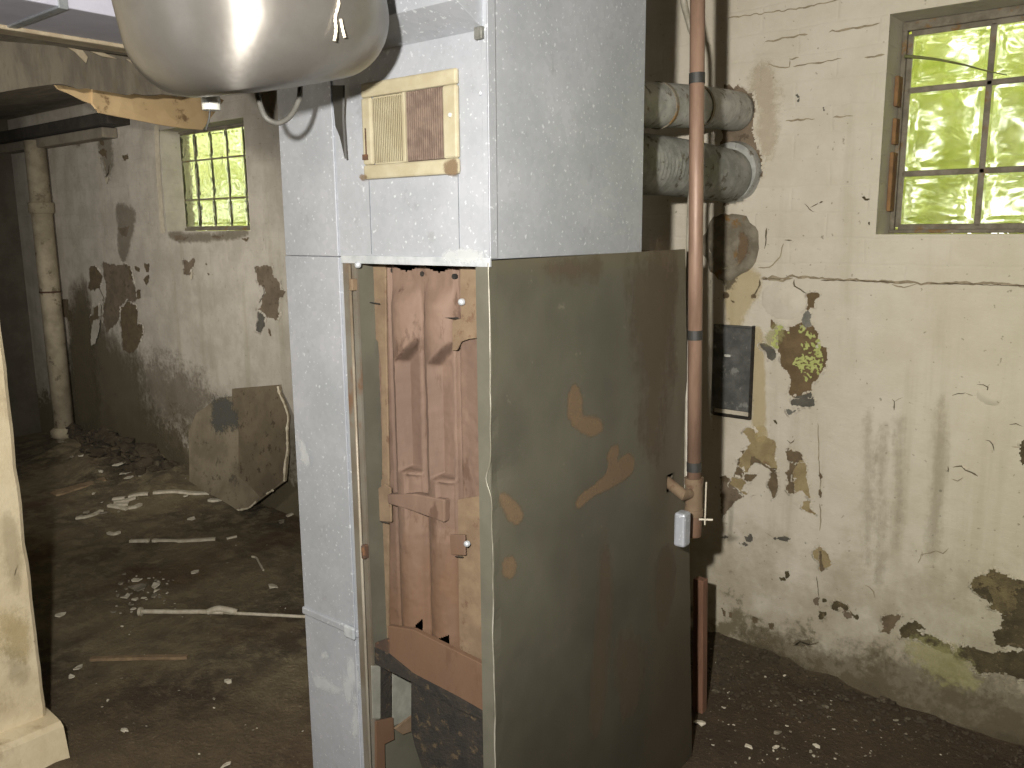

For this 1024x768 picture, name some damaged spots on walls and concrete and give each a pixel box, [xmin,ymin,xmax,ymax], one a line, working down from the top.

peeling [88,261,149,354]
peeling [182,258,209,280]
peeling [254,264,286,336]
crack [753,228,1024,297]
water stain [68,283,184,463]
peeling [757,290,828,424]
water stain [211,396,239,435]
peeling [717,426,818,519]
flaking render [810,545,835,572]
flaking render [813,597,859,620]
peeling [878,566,1024,684]